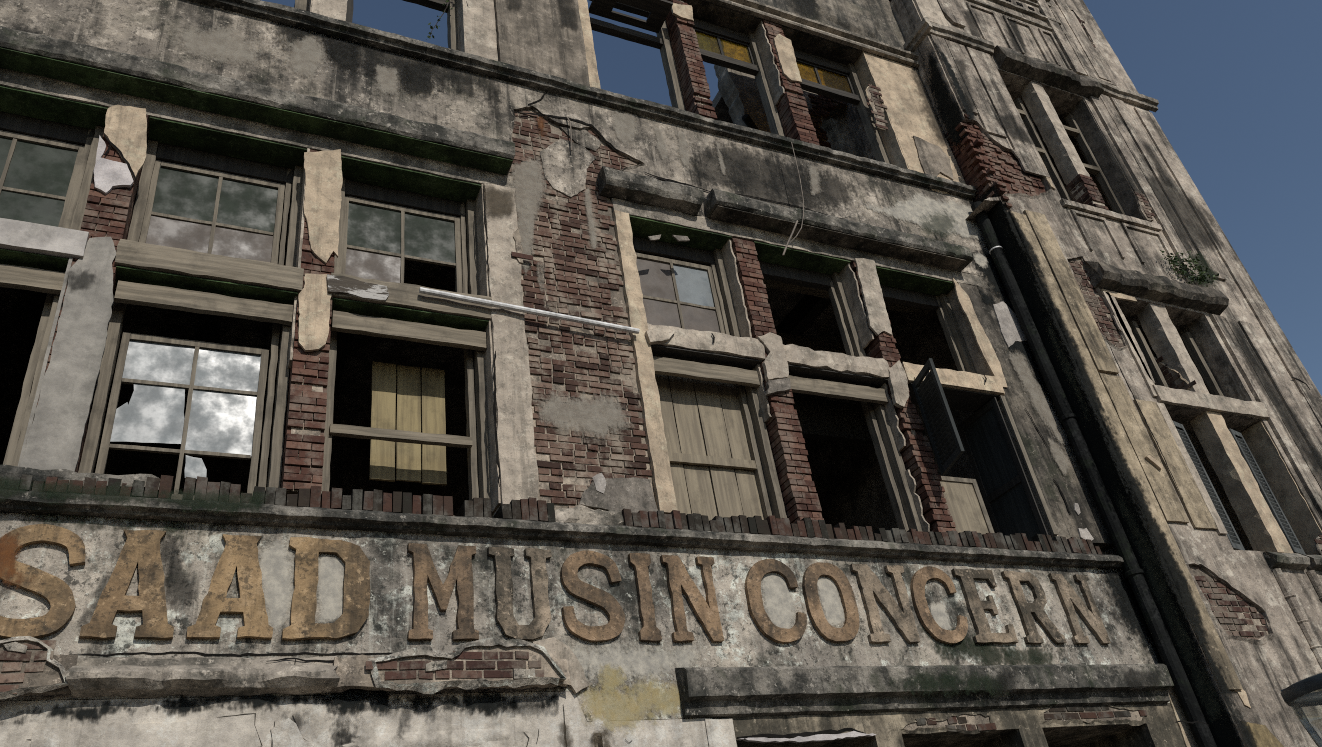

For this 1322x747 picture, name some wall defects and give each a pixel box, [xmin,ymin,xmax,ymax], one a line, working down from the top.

leakage [559,0,577,30]
flaking render [773,34,802,84]
flaking render [93,105,147,194]
flaking render [508,106,645,200]
flaking render [913,114,1109,210]
flaking render [298,149,389,352]
flaking render [0,636,69,699]
flaking render [365,637,589,694]
leakage [568,640,704,692]
leakage [15,700,134,723]
leakage [156,689,571,747]
leakage [591,730,610,747]